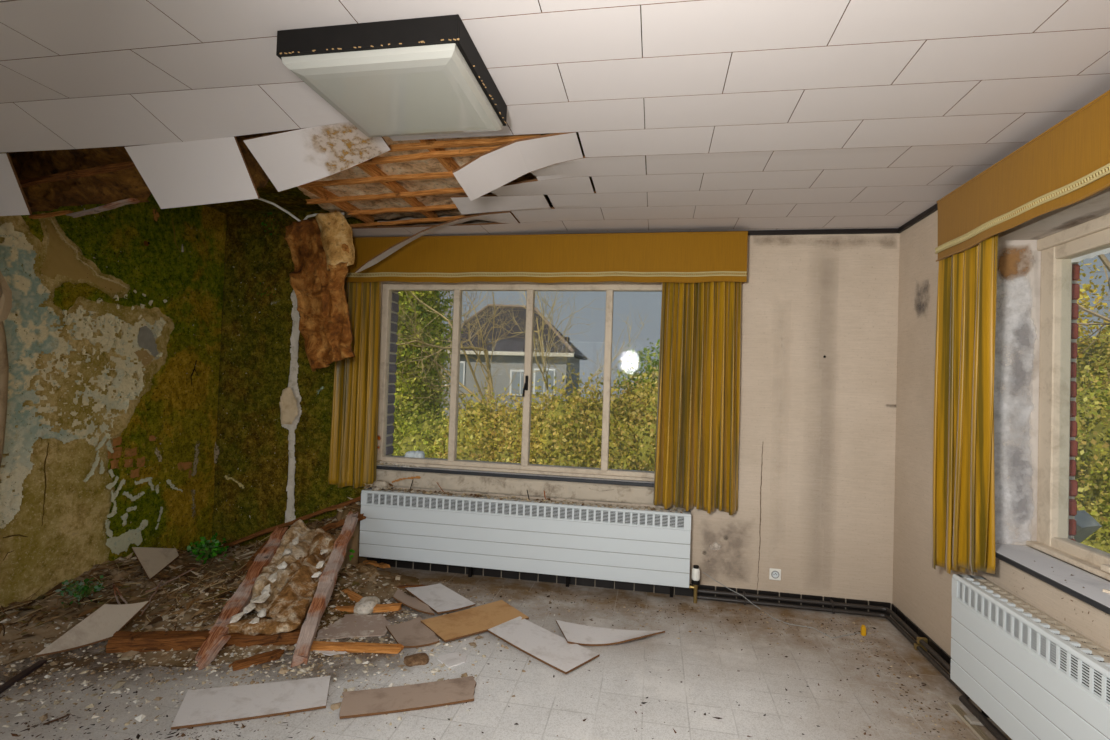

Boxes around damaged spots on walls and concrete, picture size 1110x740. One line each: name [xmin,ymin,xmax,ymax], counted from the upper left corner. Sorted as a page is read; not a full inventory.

damp [314,125,381,171]
peeling [0,222,192,555]
peeling [994,270,1036,543]